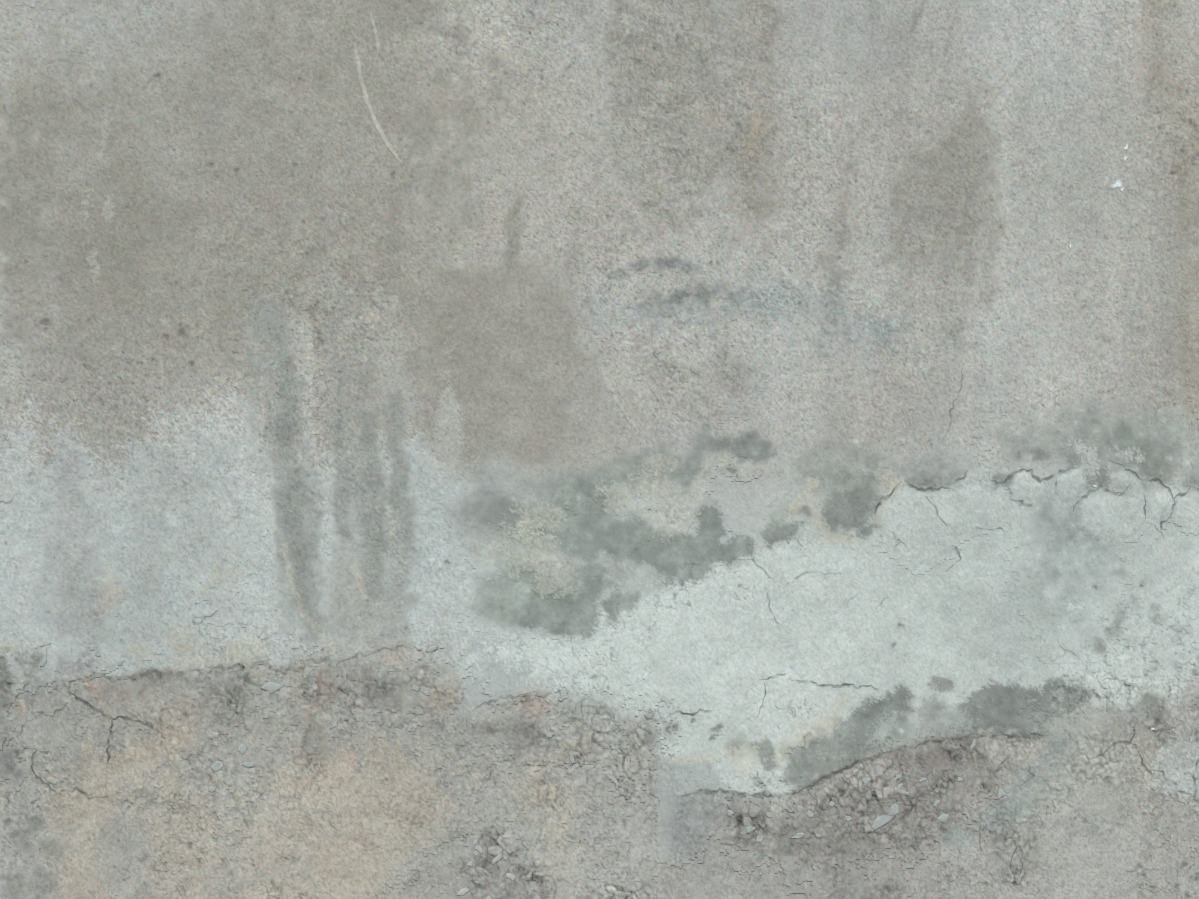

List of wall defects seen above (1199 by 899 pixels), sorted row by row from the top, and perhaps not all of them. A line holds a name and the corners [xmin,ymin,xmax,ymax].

damp [1137,412,1199,495]
crack [874,461,1199,572]
crack [0,679,169,799]
flaking render [0,621,1053,899]
damp [938,728,1083,899]
flaking render [1128,794,1199,899]
damp [1178,834,1199,899]